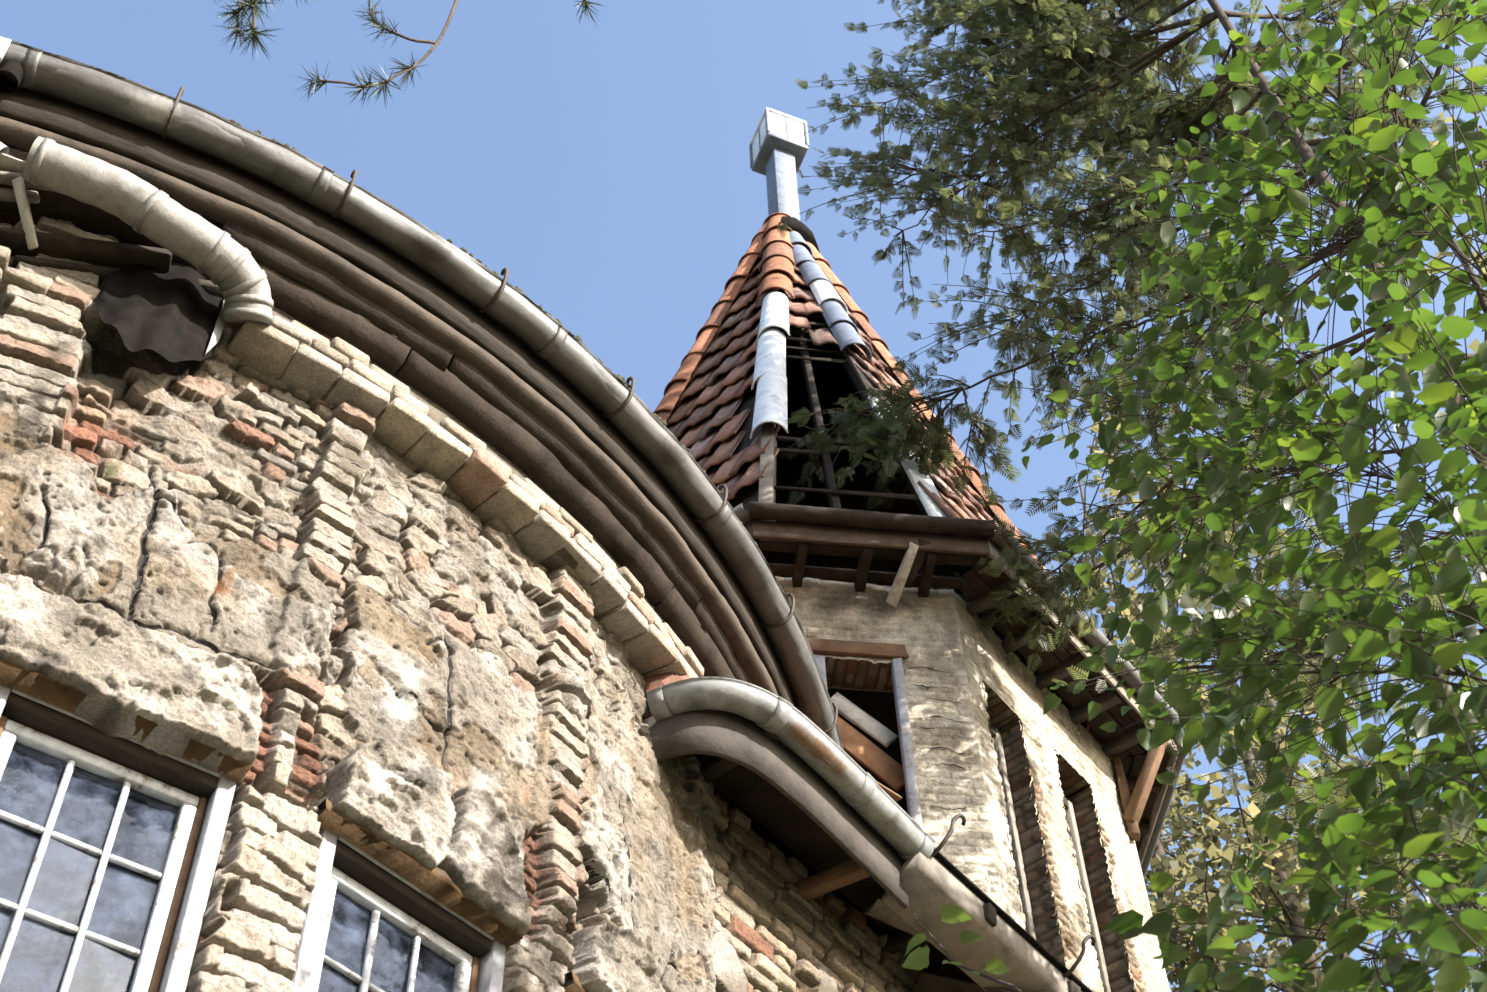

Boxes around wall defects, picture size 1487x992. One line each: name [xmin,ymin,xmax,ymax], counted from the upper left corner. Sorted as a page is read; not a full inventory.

spalling [51,309,333,561]
crack [38,498,51,549]
crack [82,471,279,670]
spalling [241,672,332,814]
crack [393,637,453,800]
spalling [522,821,609,949]
spalling [1023,754,1083,962]